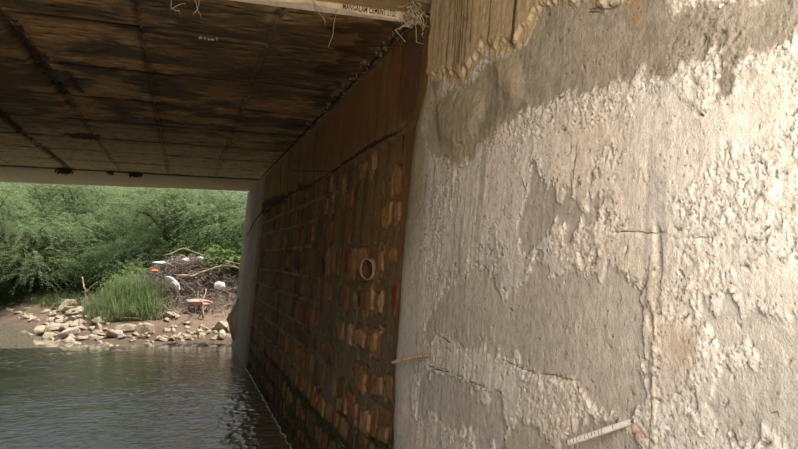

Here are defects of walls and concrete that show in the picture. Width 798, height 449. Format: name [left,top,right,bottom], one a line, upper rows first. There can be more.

water stain [0,0,64,105]
water stain [130,0,798,168]
crack [428,365,501,394]
crack [501,358,573,380]
peeling [679,226,798,449]